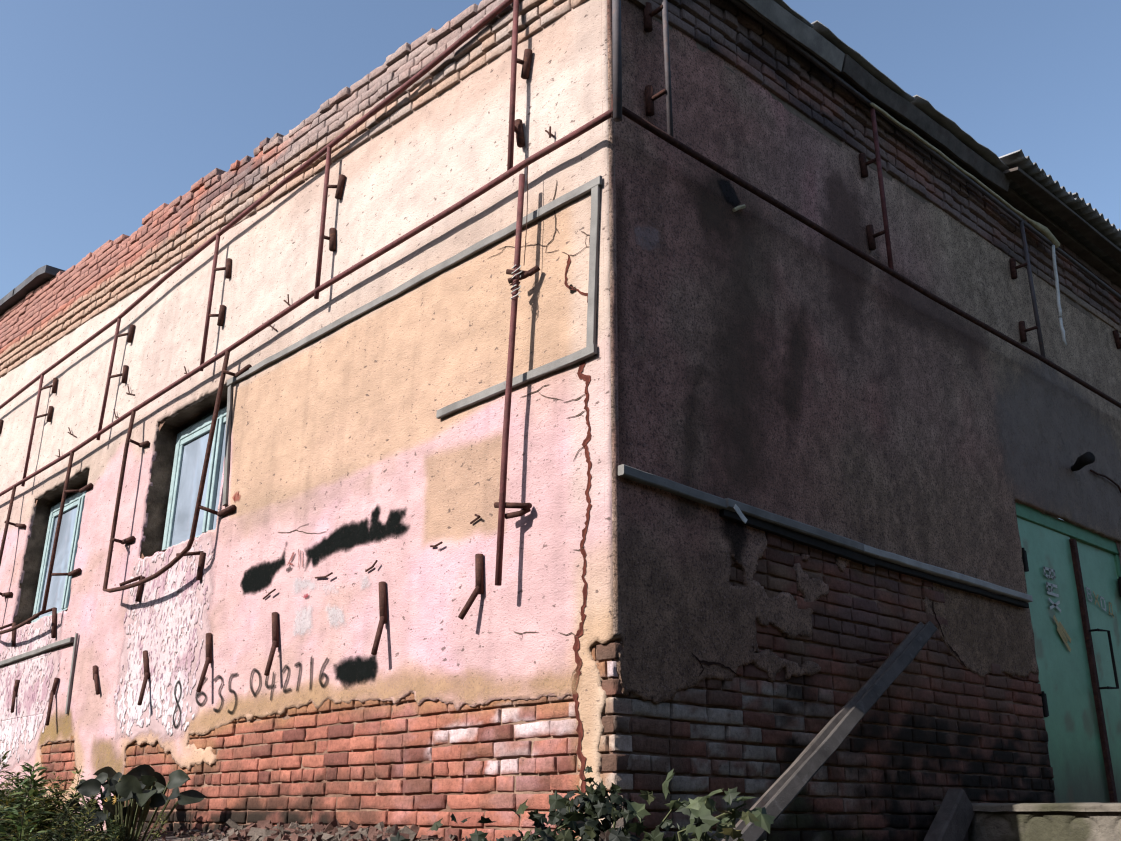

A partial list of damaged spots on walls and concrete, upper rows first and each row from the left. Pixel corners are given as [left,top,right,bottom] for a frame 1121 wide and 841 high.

crack [487,182,590,303]
peeling [0,613,76,790]
spalling [114,533,580,841]
crack [515,362,592,793]
spalling [591,532,1055,841]